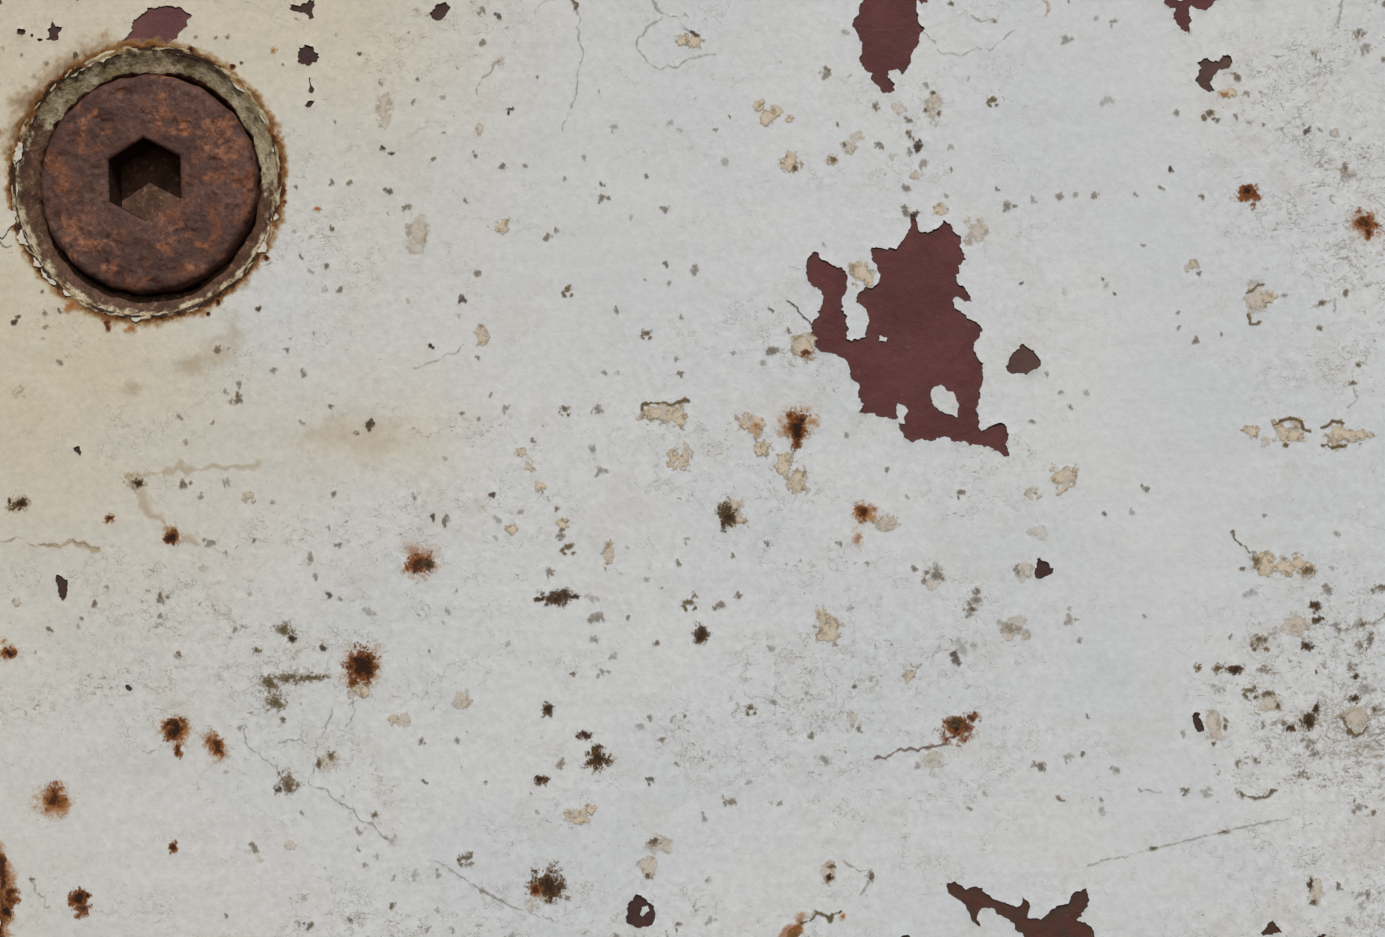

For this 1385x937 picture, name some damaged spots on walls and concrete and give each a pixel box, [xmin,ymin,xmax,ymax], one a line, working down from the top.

peeling [1164,0,1216,33]
peeling [852,0,928,93]
rust [5,38,288,332]
peeling [806,214,1009,457]
rust [779,407,819,452]
rust [404,550,434,575]
rust [342,641,381,688]
rust [160,715,190,759]
rust [874,711,982,774]
rust [35,780,71,818]
rust [0,845,21,937]
peeling [946,881,1095,937]